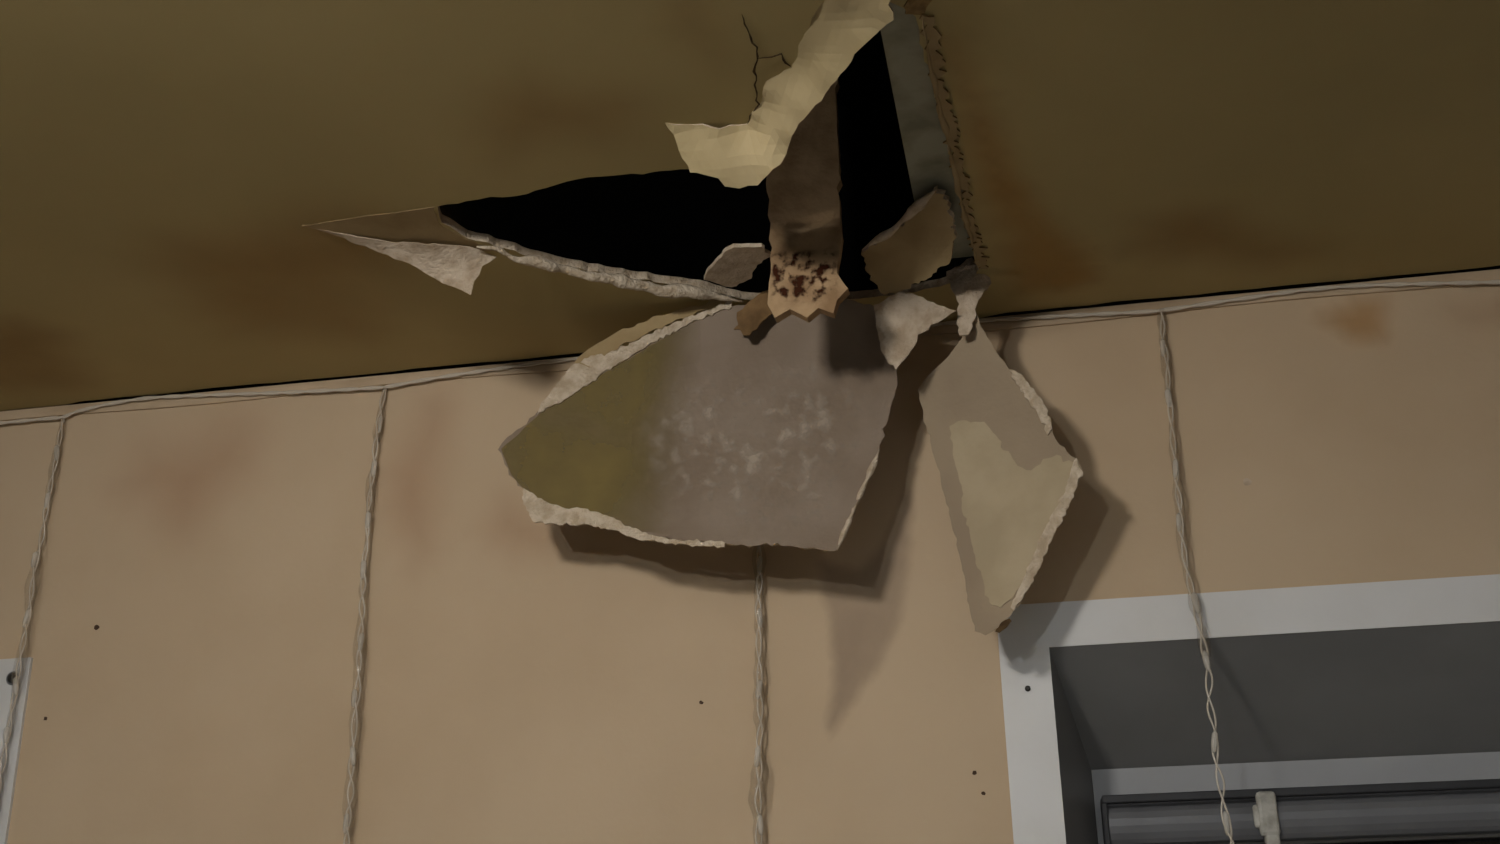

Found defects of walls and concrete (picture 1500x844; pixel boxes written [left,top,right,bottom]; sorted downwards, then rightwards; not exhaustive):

crack [742,15,791,124]
peeling [665,0,894,188]
crack [904,0,932,15]
peeling [949,420,1073,608]